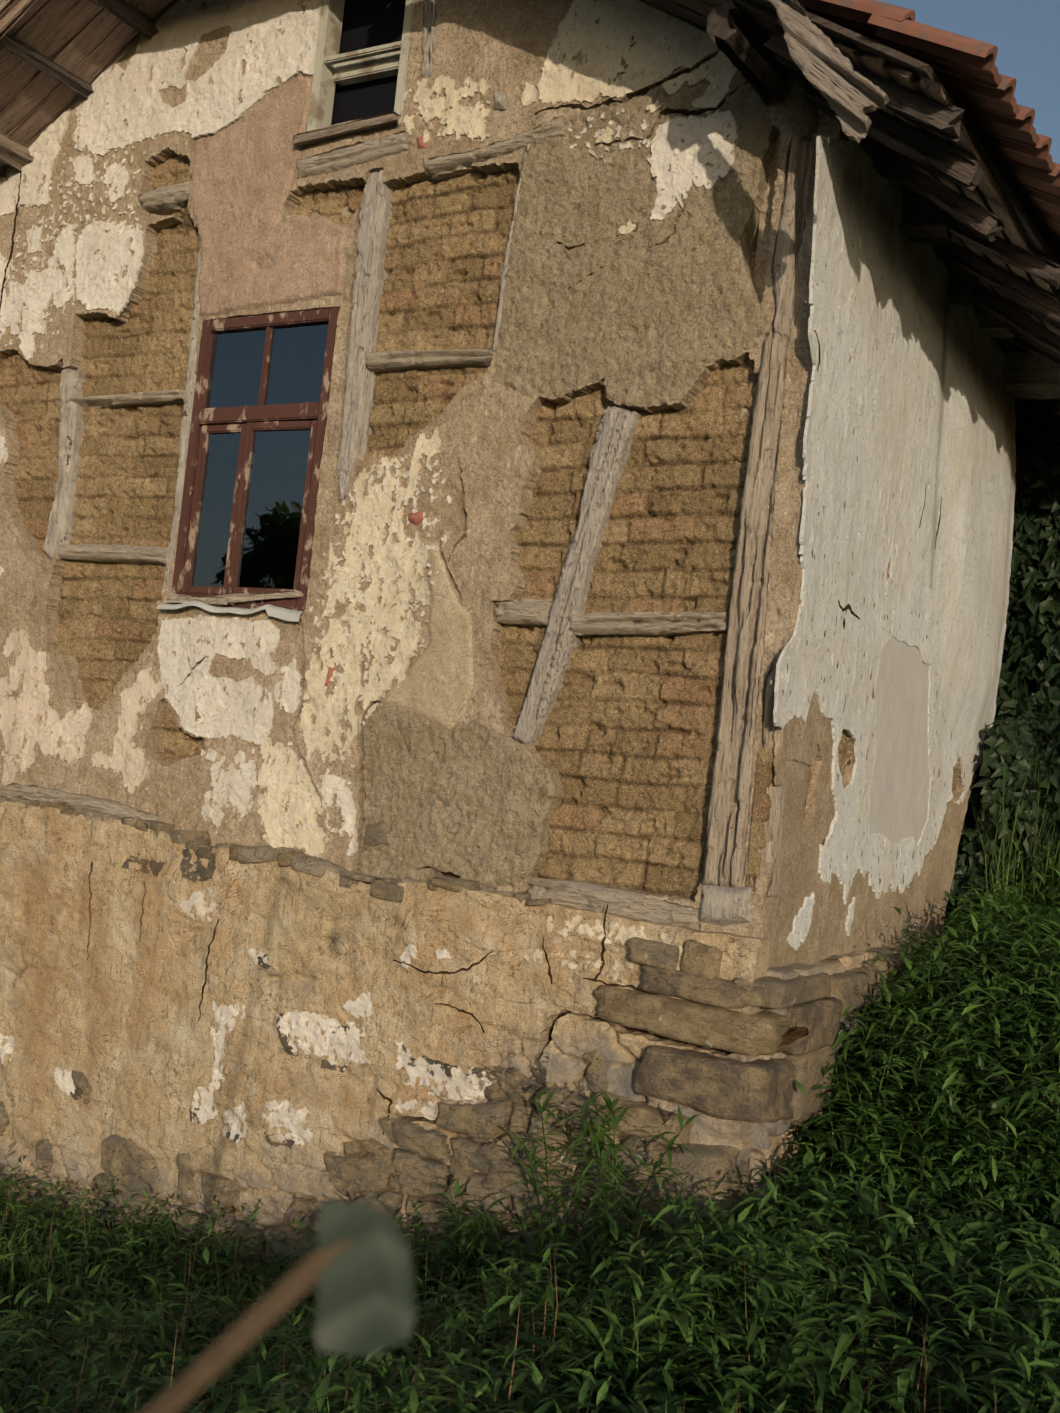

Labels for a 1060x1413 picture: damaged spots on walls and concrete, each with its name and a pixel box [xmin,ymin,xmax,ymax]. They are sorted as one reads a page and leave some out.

crack [0,171,21,309]
spalling [375,168,520,352]
spalling [0,150,201,710]
spalling [335,366,488,557]
spalling [517,362,758,613]
spalling [496,624,547,732]
spalling [535,632,727,900]
crack [86,862,94,960]
crack [197,919,219,1023]
crack [393,951,493,1033]
crack [542,904,734,1053]
crack [377,1088,425,1135]